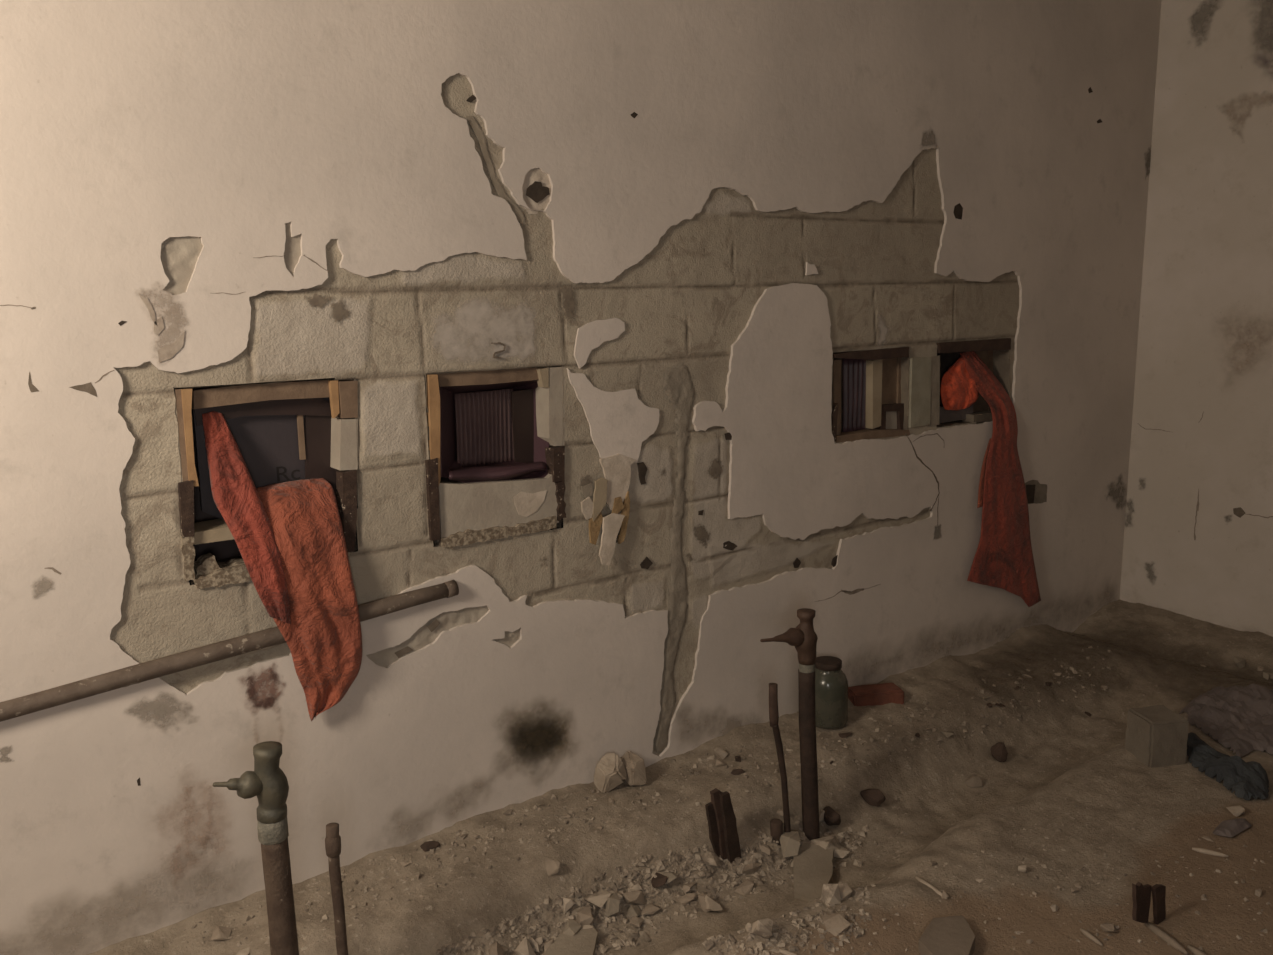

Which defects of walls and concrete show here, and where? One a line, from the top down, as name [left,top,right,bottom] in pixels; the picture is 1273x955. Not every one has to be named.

damp [1192,0,1218,36]
spalling [110,74,1020,756]
crack [815,584,880,602]
corrosion [247,668,281,708]